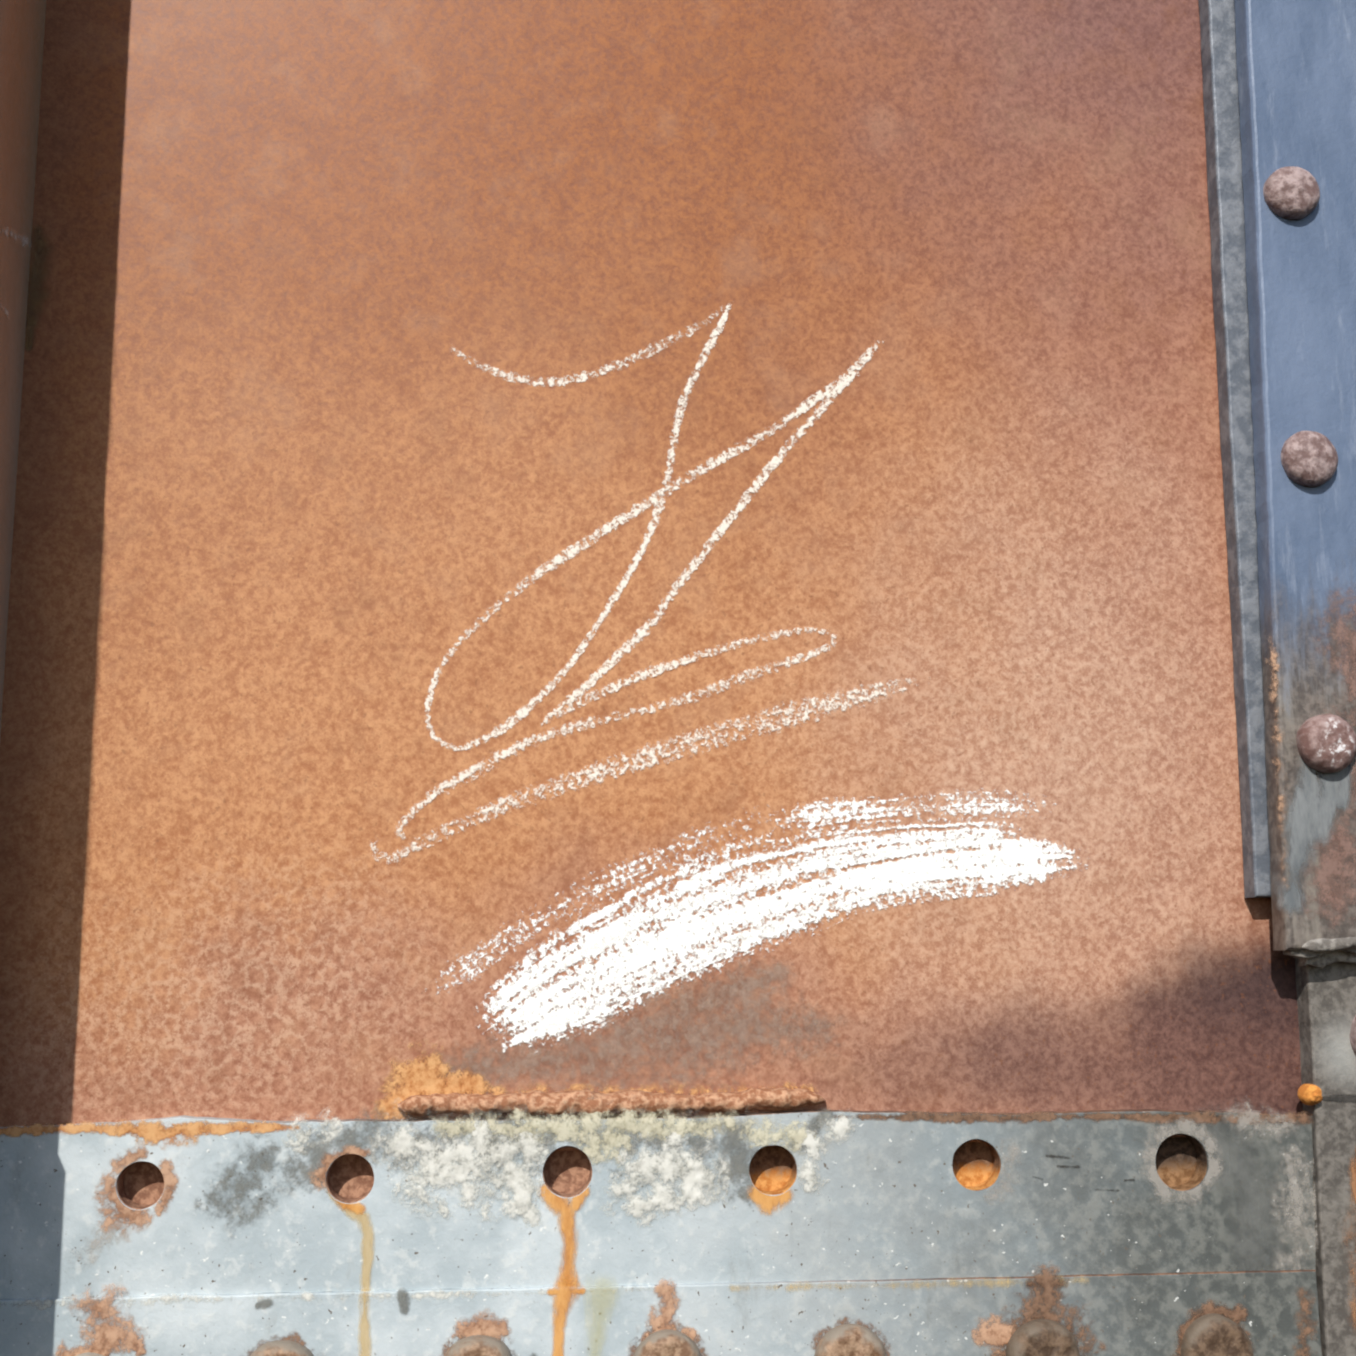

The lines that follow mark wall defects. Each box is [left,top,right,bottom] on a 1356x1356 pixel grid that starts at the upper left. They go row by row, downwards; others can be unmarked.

rust [1271,651,1281,741]
rust [375,1052,504,1119]
rust [0,1120,300,1231]
efflorescence [197,1108,855,1226]
rust [55,1286,146,1356]
rust [311,1146,373,1356]
rust [541,1184,589,1356]
rust [629,1279,707,1356]
rust [972,1265,1105,1356]